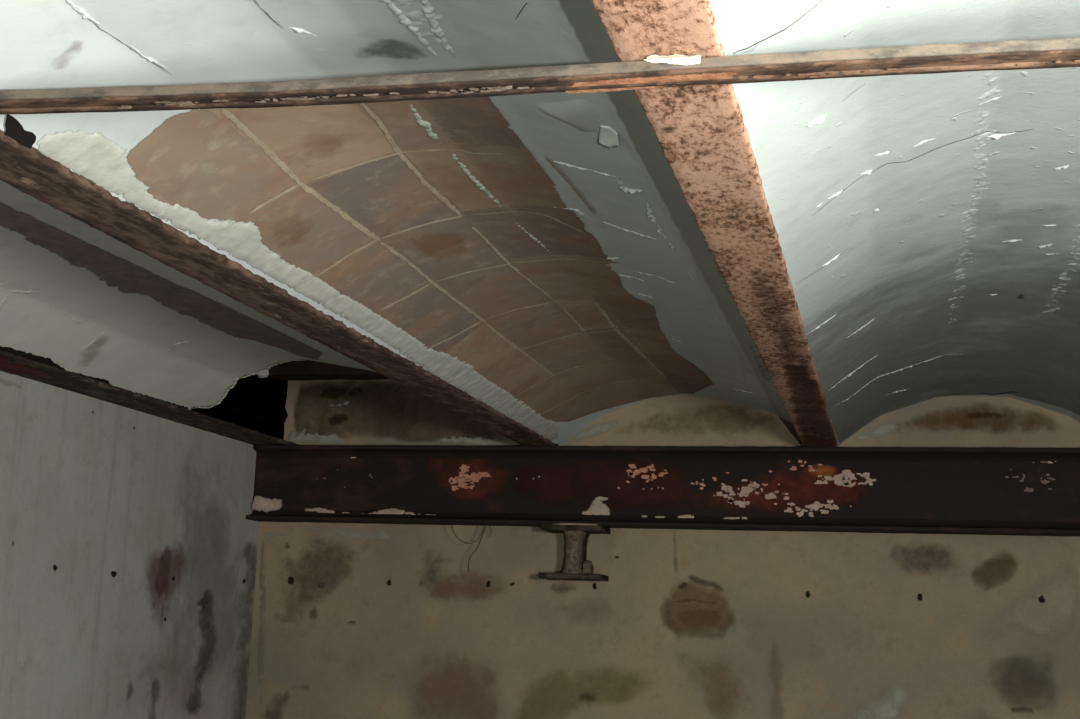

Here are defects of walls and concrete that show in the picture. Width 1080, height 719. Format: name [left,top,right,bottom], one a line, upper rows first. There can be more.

corrosion [566,72,737,93]
peeling [127,86,713,422]
spalling [0,203,498,441]
corrosion [752,273,836,447]
corrosion [433,459,507,498]
corrosion [521,462,863,510]
damp [974,557,1014,586]
damp [198,591,215,678]